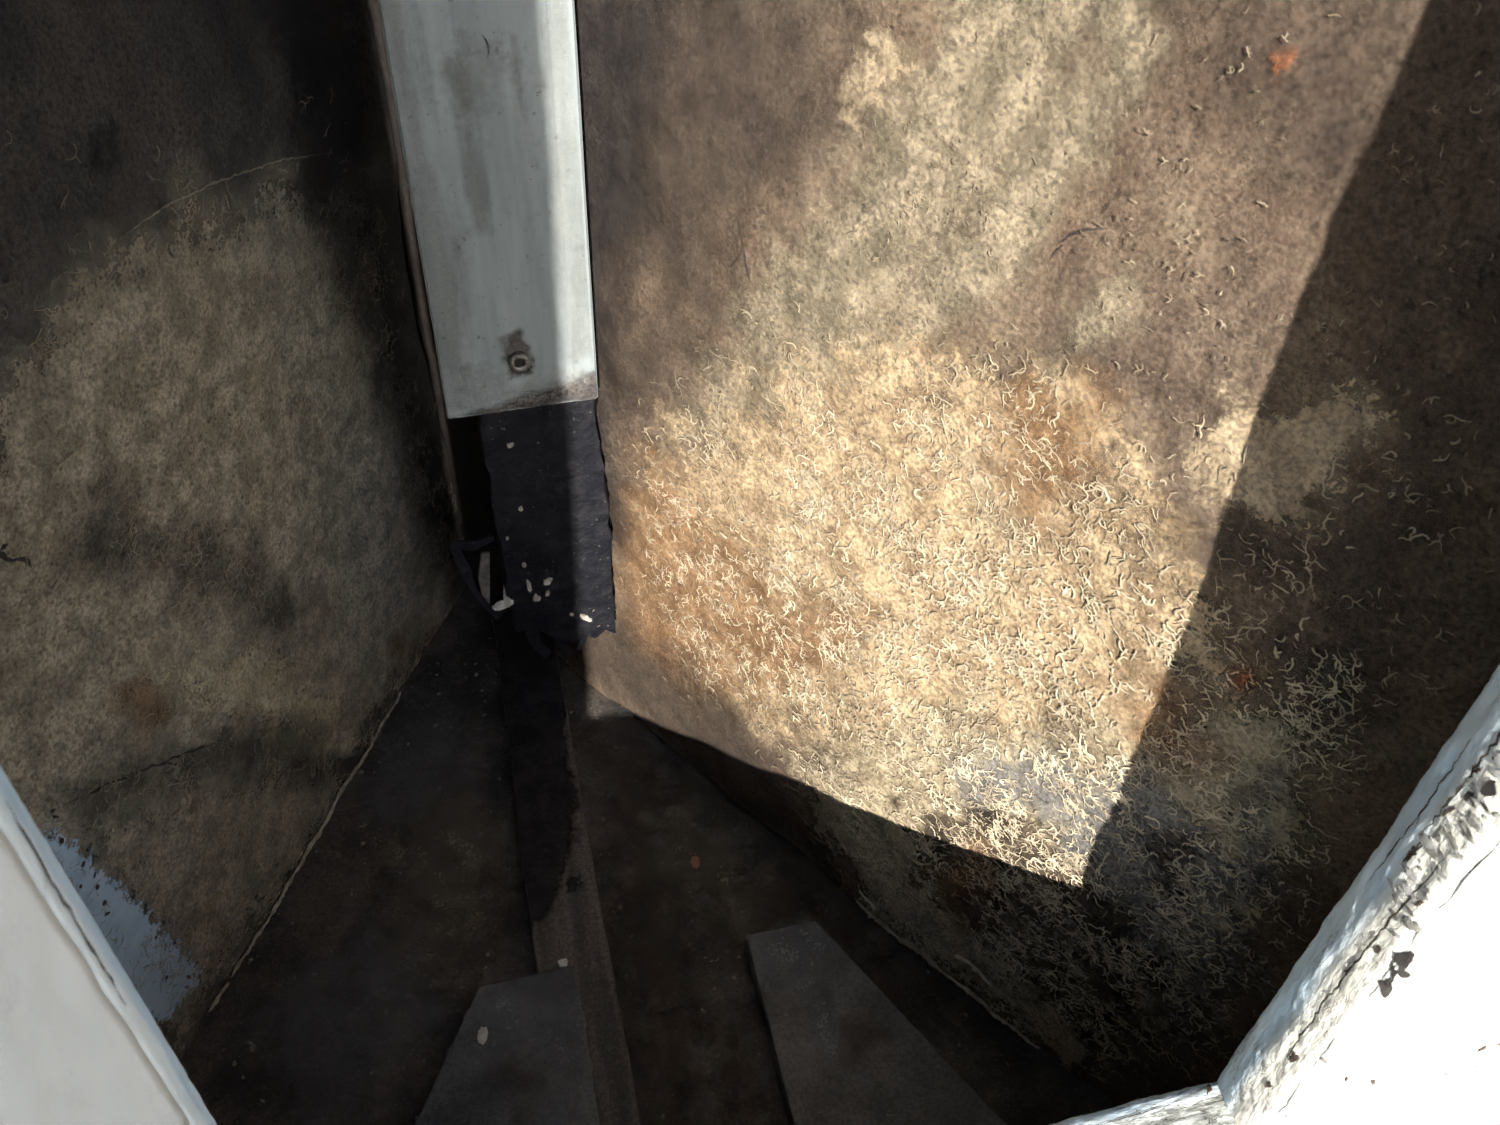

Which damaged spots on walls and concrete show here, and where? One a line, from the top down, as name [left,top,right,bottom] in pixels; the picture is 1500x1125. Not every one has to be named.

damp [0,0,504,1059]
damp [557,0,1344,1078]
flaking render [1387,747,1500,940]